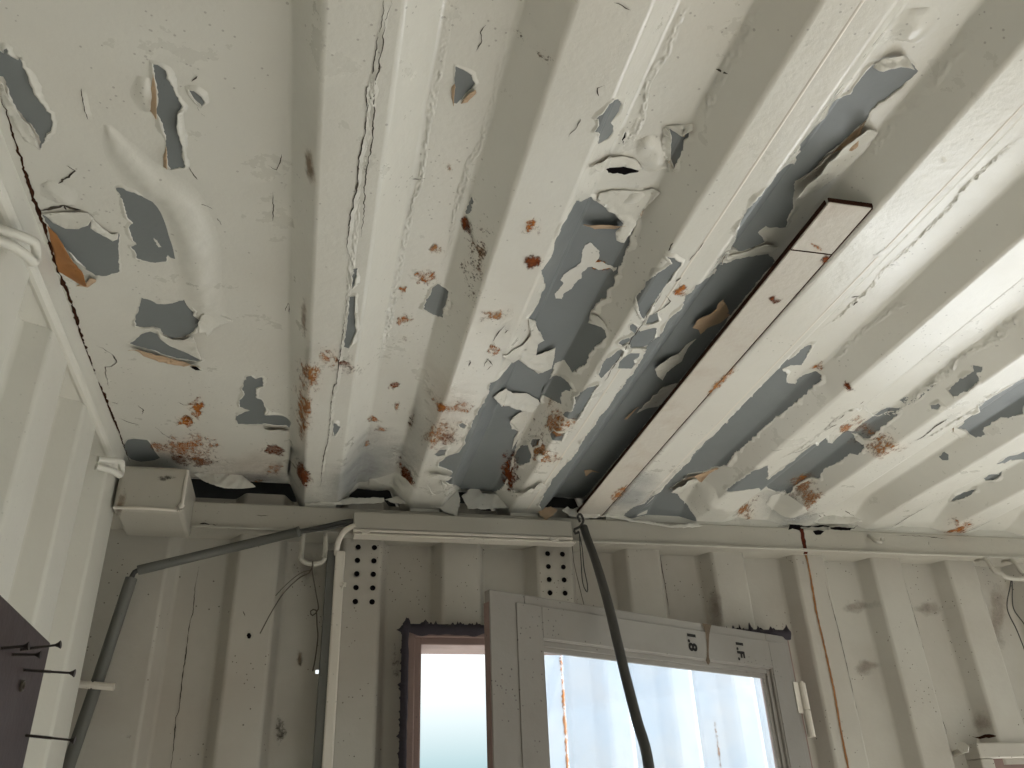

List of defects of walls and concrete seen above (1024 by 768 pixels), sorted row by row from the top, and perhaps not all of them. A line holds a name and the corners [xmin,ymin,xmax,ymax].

crack [81,89,93,120]
peeling [148,59,210,171]
crack [346,0,392,259]
crack [0,96,172,460]
peeling [41,184,175,288]
peeling [127,297,232,371]
corrosion [151,397,218,466]
crack [321,307,349,486]
corrosion [524,255,541,269]
corrosion [577,198,873,518]
peeling [434,0,1024,521]
corrosion [800,528,849,768]